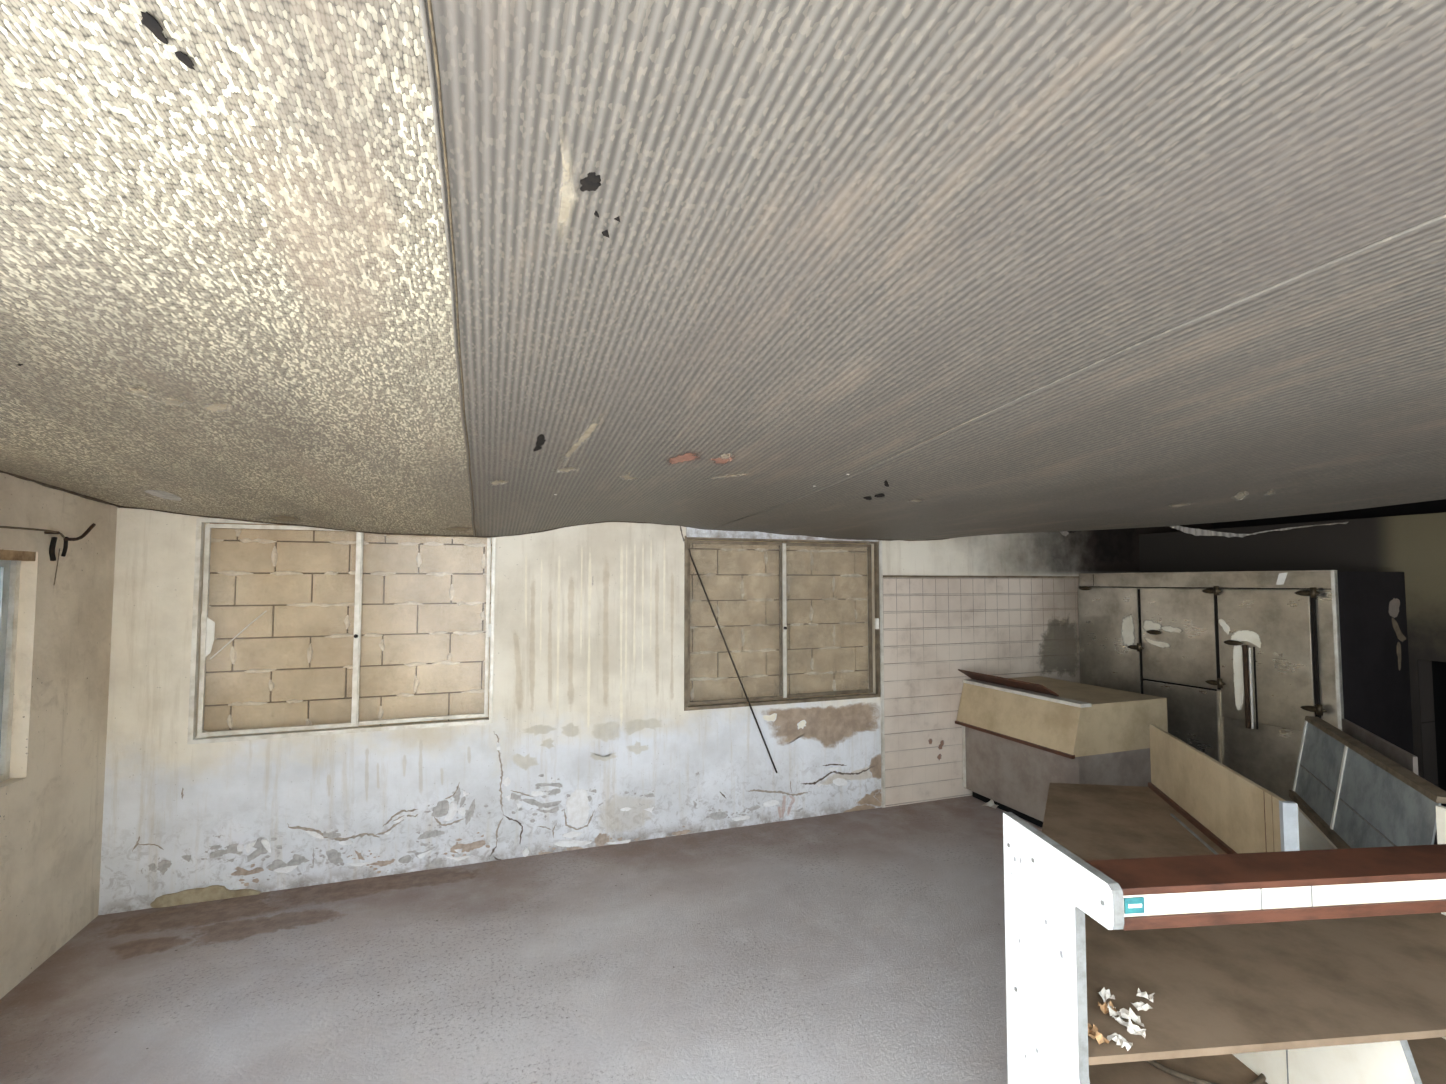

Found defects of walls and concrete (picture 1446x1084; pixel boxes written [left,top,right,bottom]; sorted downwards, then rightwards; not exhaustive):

peeling [141,782,496,886]
flaking render [510,774,657,857]
peeling [686,799,779,821]